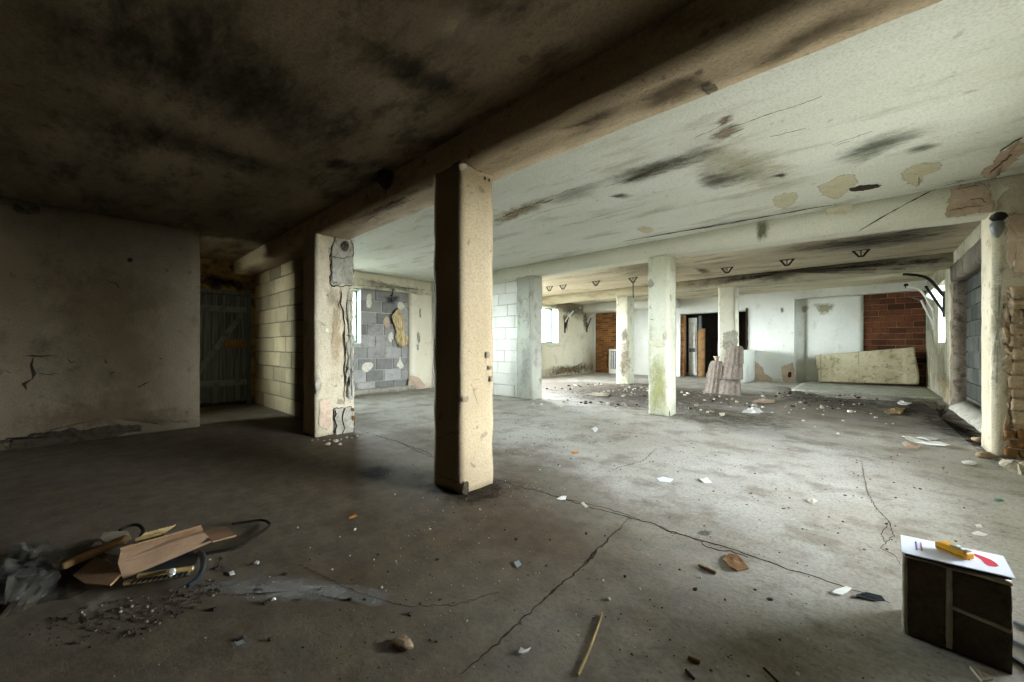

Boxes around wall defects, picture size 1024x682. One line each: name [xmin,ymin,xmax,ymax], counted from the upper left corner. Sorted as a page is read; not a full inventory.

water stain [621,151,706,181]
water stain [704,157,785,186]
peeling [817,174,858,214]
water stain [847,136,932,157]
peeling [901,162,942,186]
crack [859,137,1022,231]
peeling [945,183,995,217]
spalling [315,237,355,435]
spalling [1000,213,1024,460]
crack [334,288,459,483]
crack [861,460,900,564]
crack [466,480,860,670]